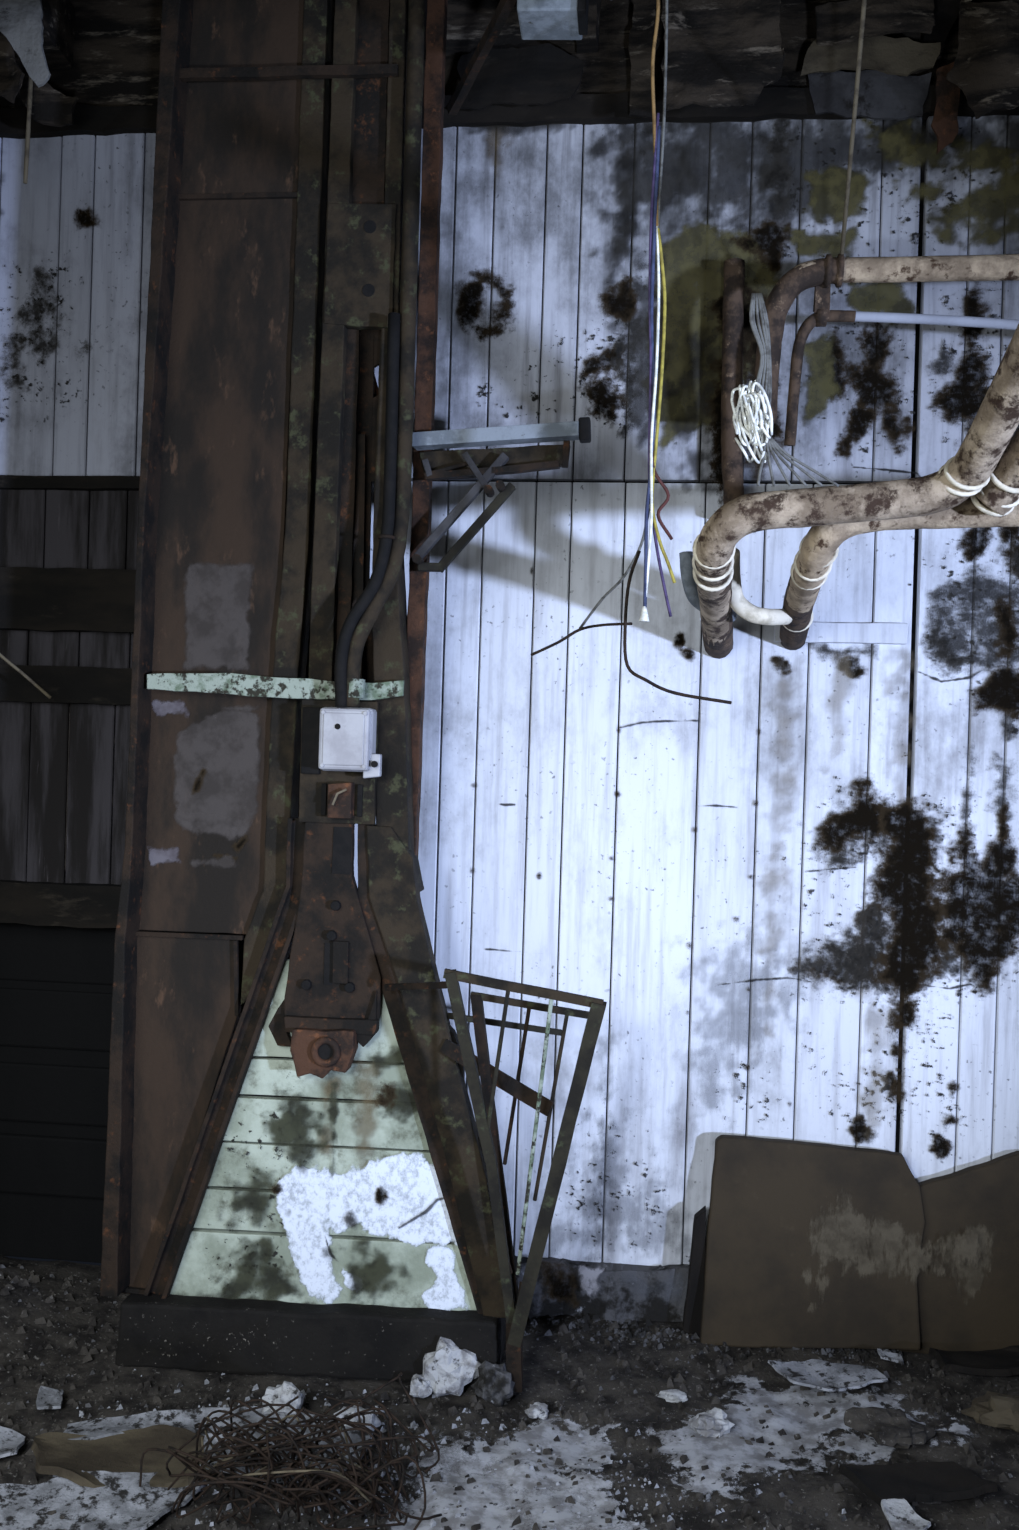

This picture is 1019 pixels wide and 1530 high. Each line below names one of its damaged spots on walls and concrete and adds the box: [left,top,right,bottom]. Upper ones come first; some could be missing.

water stain [456,270,515,341]
water stain [471,114,1019,461]
water stain [659,296,723,503]
water stain [742,402,784,481]
water stain [674,633,695,661]
water stain [771,656,792,676]
water stain [782,527,1019,1103]
water stain [372,1049,417,1121]
water stain [202,1077,327,1304]
peeling [276,1152,468,1311]
water stain [344,1212,406,1296]
water stain [375,1187,388,1204]